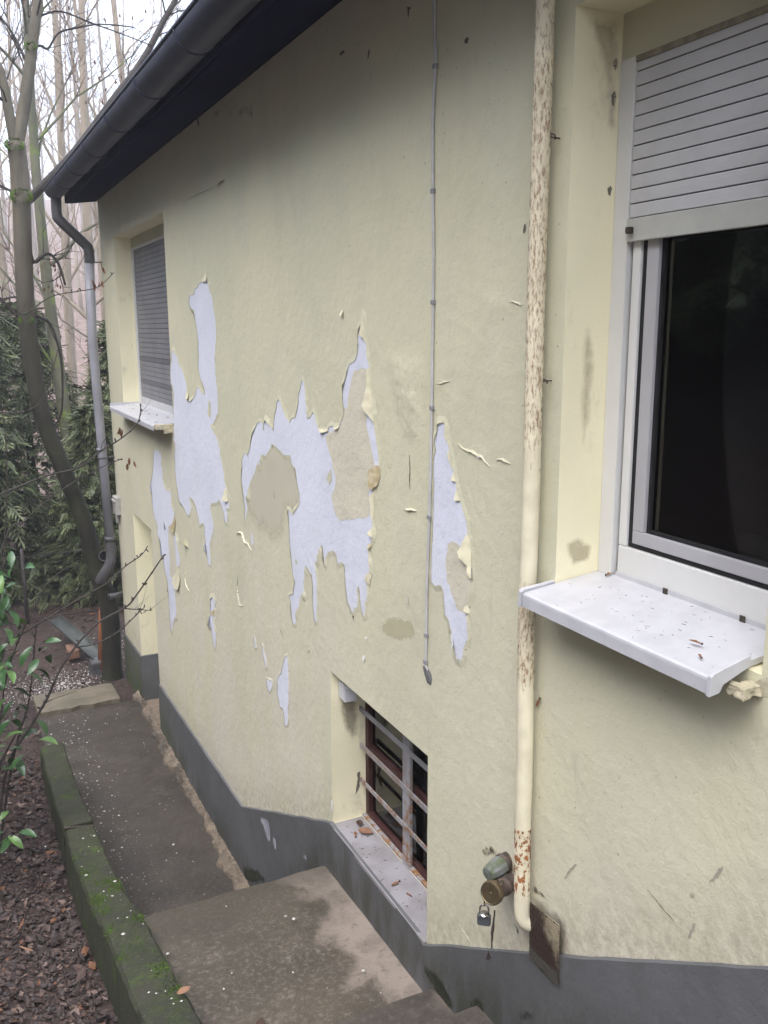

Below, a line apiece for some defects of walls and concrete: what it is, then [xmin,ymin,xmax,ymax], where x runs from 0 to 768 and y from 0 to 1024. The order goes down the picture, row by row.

corrosion [524,41,553,441]
peeling [149,269,382,636]
peeling [429,416,477,668]
peeling [253,635,290,728]
corrosion [514,827,531,896]